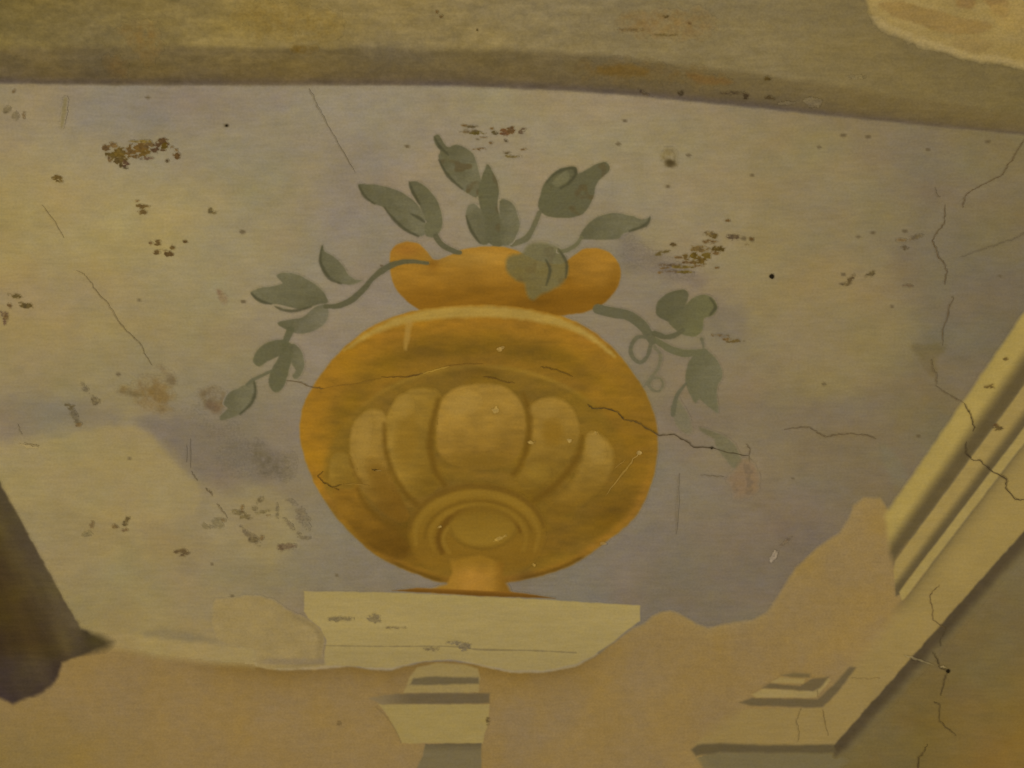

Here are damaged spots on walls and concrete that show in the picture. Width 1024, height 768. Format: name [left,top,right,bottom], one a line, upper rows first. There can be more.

peeling [864,0,1024,71]
peeling [101,137,181,170]
peeling [459,124,527,158]
peeling [654,219,754,275]
crack [931,140,1024,501]
crack [287,363,514,389]
crack [587,404,751,477]
crack [784,426,875,439]
flaking render [0,496,900,768]
crack [929,586,956,736]